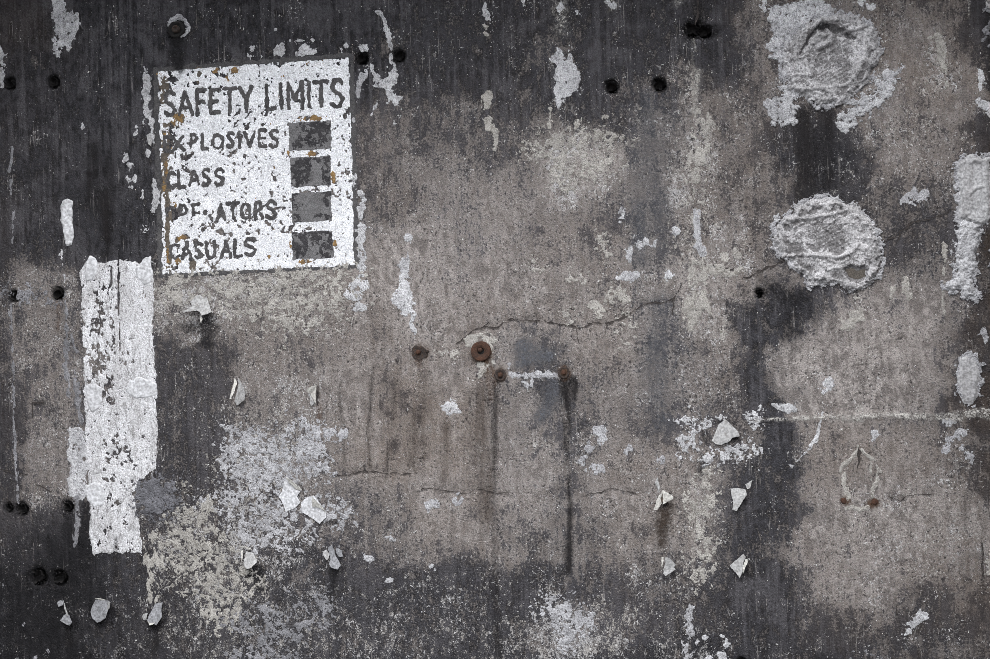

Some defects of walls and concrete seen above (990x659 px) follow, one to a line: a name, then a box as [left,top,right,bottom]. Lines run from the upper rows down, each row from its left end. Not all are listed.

crack [456,284,682,344]
peeling [39,199,359,637]
damp [534,377,578,440]
peeling [578,425,609,475]
peeling [424,492,466,513]
peeling [275,582,339,648]
peeling [661,519,731,659]
peeling [730,554,748,578]